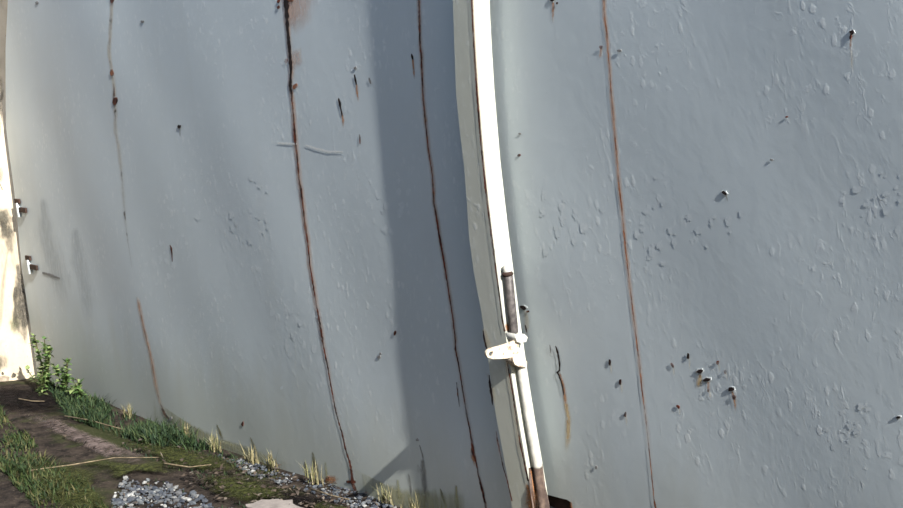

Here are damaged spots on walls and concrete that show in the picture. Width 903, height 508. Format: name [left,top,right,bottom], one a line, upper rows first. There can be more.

leakage [0,211,13,238]
leakage [12,265,28,338]
corrosion [527,464,550,508]